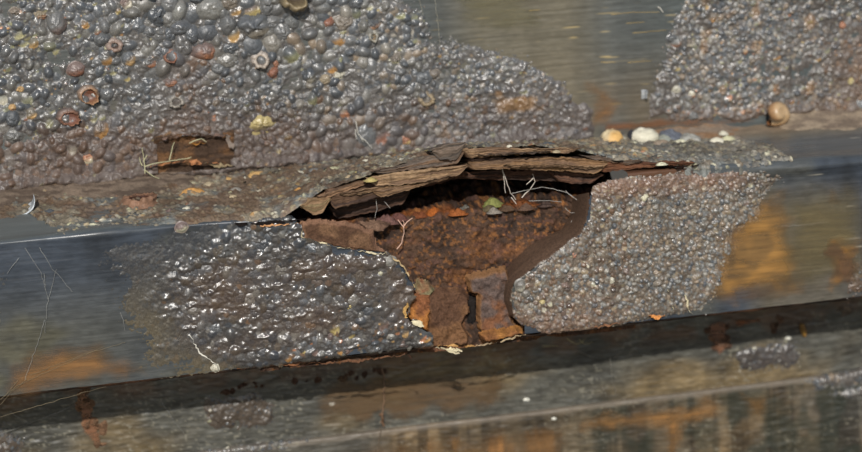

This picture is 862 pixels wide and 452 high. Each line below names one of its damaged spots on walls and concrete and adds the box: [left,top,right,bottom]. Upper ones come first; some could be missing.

spalling [237,171,636,372]
corrosion [717,206,790,293]
corrosion [16,353,103,388]
corrosion [74,388,108,449]